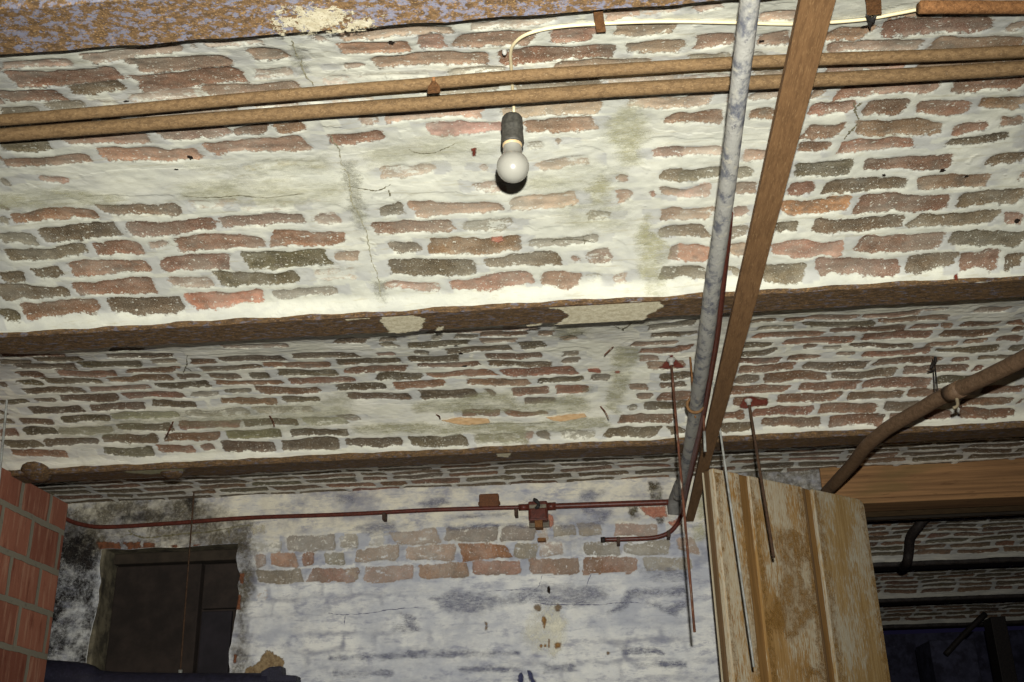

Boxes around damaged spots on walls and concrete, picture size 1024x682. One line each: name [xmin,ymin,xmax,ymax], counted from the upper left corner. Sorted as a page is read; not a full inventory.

crack [292,41,314,85]
crack [330,134,391,297]
damp [80,535,99,663]
damp [233,547,255,673]
spalling [233,650,285,673]